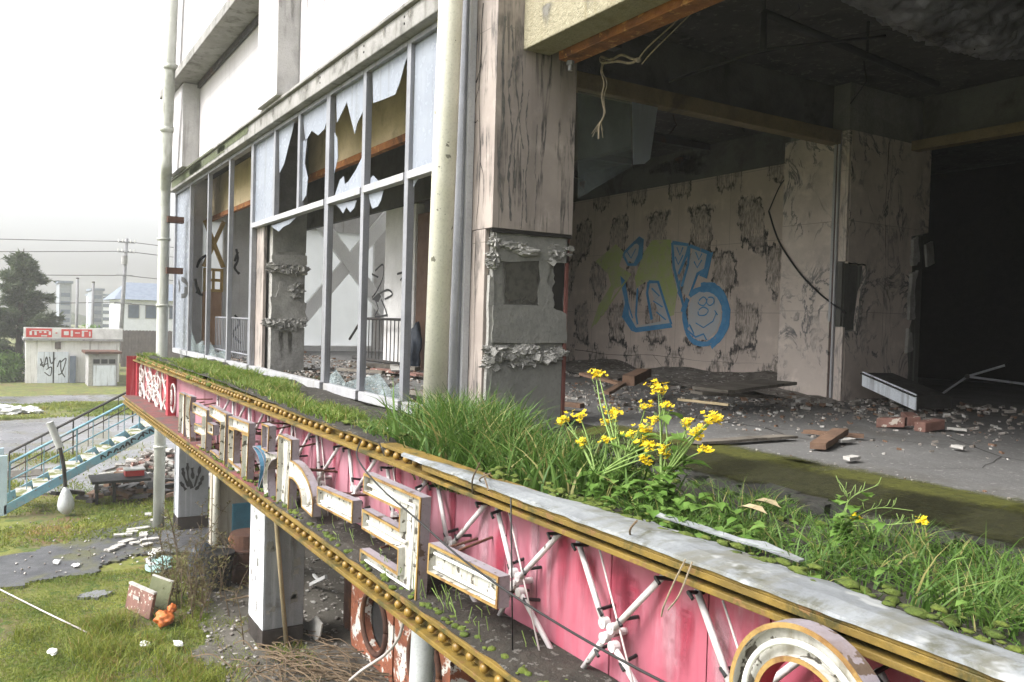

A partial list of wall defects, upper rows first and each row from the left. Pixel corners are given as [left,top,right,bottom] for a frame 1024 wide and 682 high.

water stain [497,16,538,230]
spalling [260,146,311,371]
spalling [479,228,575,441]
water stain [576,432,1024,543]
spalling [686,475,1024,571]